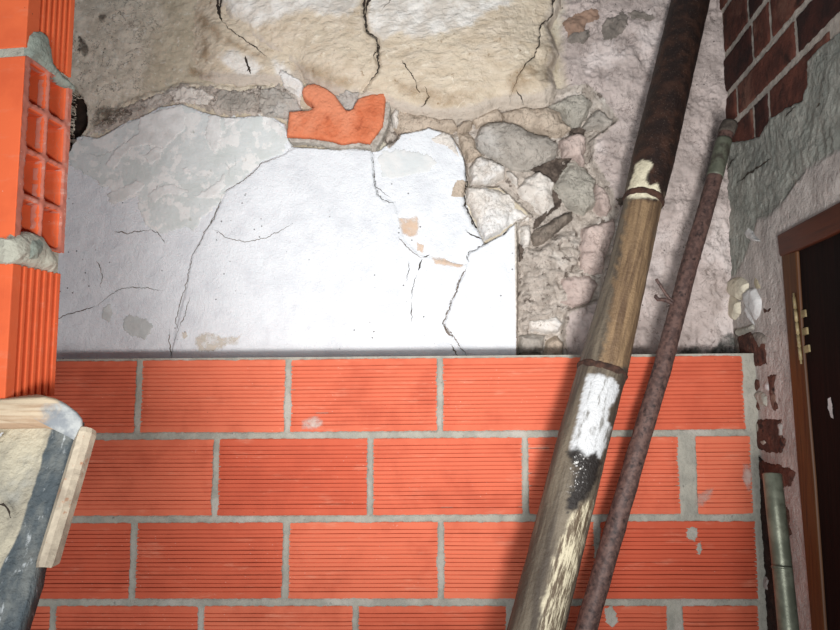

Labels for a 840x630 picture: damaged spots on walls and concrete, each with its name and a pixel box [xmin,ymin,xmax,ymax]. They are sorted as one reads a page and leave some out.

peeling [69,70,305,234]
crack [216,0,267,74]
flaking render [336,90,360,111]
crack [362,0,390,90]
crack [509,0,555,105]
spalling [562,8,655,44]
flaking render [720,0,840,142]
crack [58,158,293,357]
crack [399,239,429,321]
crack [442,176,511,356]
spalling [384,84,623,355]
flaking render [754,374,796,487]